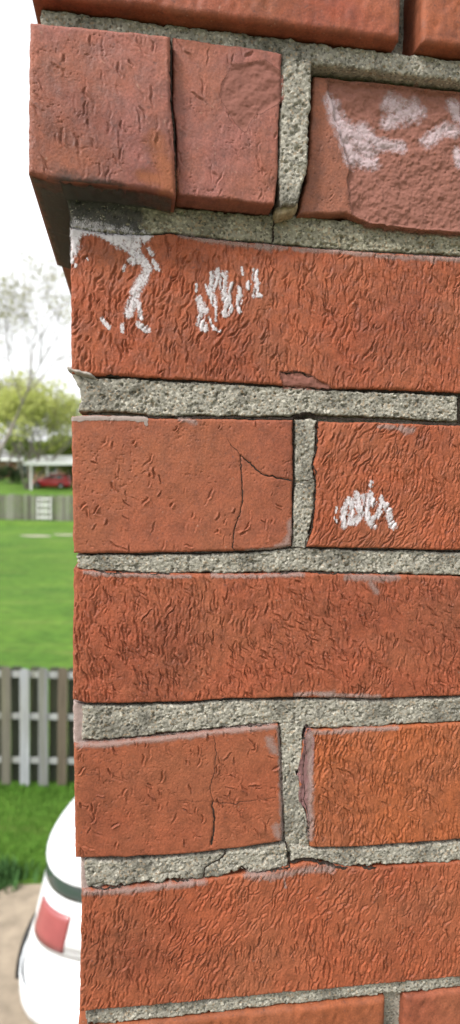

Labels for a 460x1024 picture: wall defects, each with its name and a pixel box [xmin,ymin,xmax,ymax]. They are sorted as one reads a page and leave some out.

crack [89,371,460,576]
spalling [280,371,330,390]
crack [78,697,376,890]